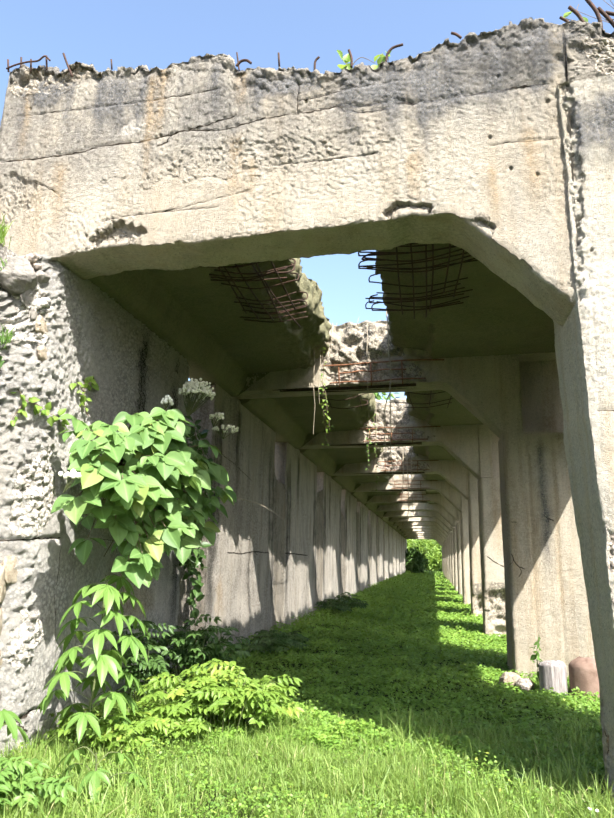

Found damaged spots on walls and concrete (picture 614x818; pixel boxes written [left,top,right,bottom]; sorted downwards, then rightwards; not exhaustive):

spalling [571,36,614,75]
spalling [8,62,102,98]
crack [5,83,549,162]
damp [571,96,614,149]
spalling [385,205,432,219]